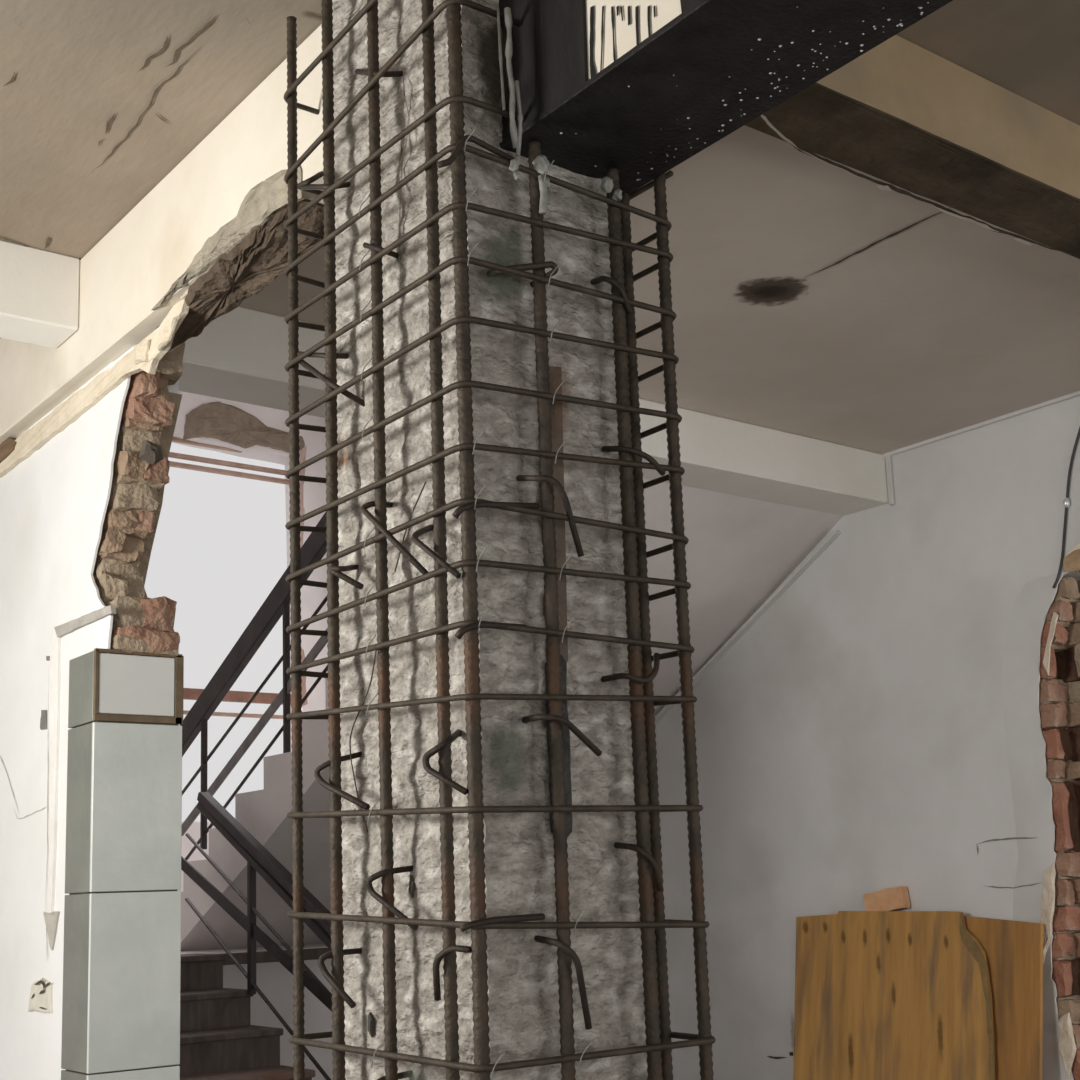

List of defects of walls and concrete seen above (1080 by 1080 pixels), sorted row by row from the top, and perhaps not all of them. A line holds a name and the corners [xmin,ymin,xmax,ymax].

crack [91,15,217,173]
crack [761,115,1078,278]
water stain [737,278,805,305]
flaking render [0,165,324,656]
crack [0,757,45,819]
crack [976,837,1038,853]
crack [987,882,1038,890]
flaking render [1002,543,1080,1080]